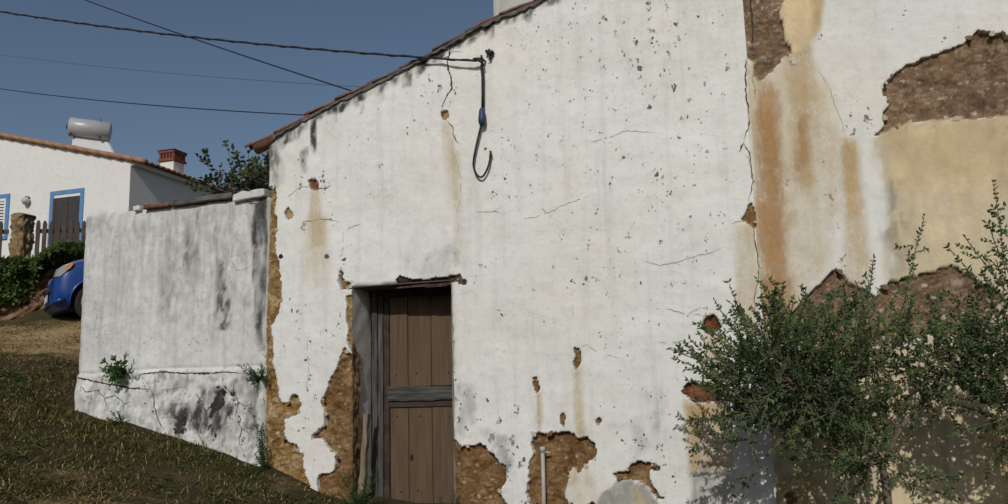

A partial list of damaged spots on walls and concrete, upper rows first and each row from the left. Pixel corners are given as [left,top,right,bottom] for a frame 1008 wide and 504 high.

spalling [743,0,822,81]
crack [723,0,762,310]
leakage [252,197,268,247]
spalling [741,200,758,229]
peeling [764,26,1008,504]
spalling [80,186,361,502]
spalling [703,306,721,335]
crack [77,370,249,451]
leakage [170,390,233,435]
spalling [677,379,724,413]
spalling [455,412,597,504]
spalling [614,417,676,499]